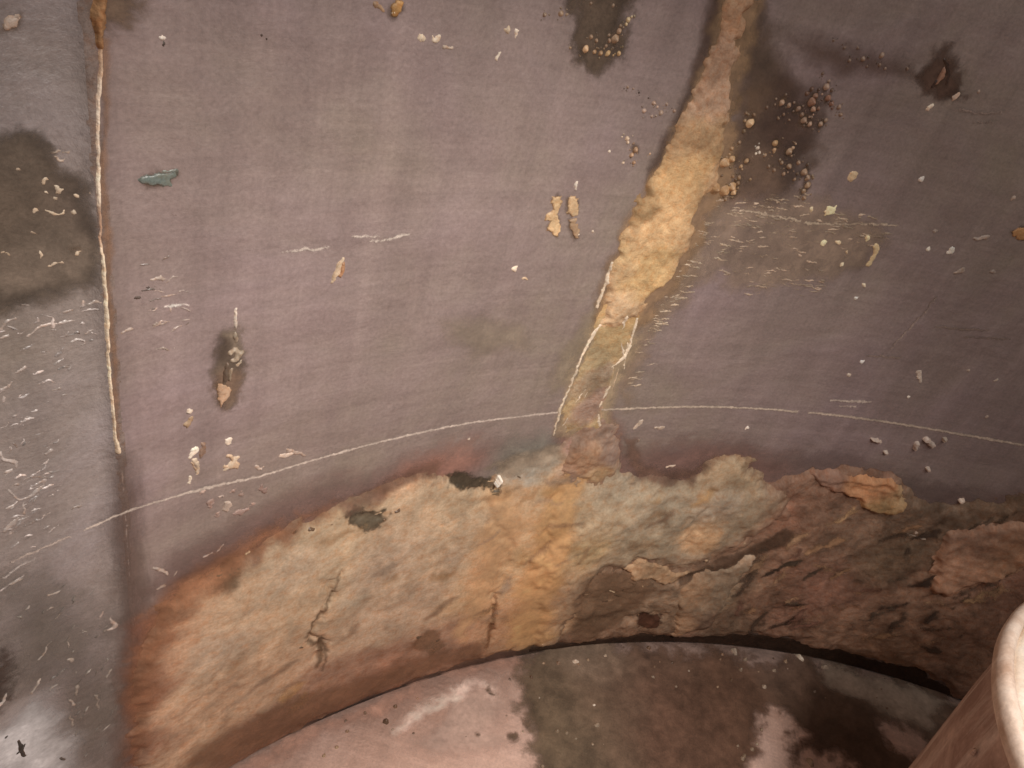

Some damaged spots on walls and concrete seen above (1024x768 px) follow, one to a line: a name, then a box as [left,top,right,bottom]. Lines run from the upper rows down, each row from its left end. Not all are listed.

peeling [138,169,179,187]
water stain [0,132,100,315]
peeling [545,181,580,238]
rust [541,0,844,436]
peeling [912,436,948,451]
crack [447,471,501,496]
crack [346,505,386,532]
crack [308,602,328,664]
rust [125,436,1024,768]
water stain [421,643,956,768]